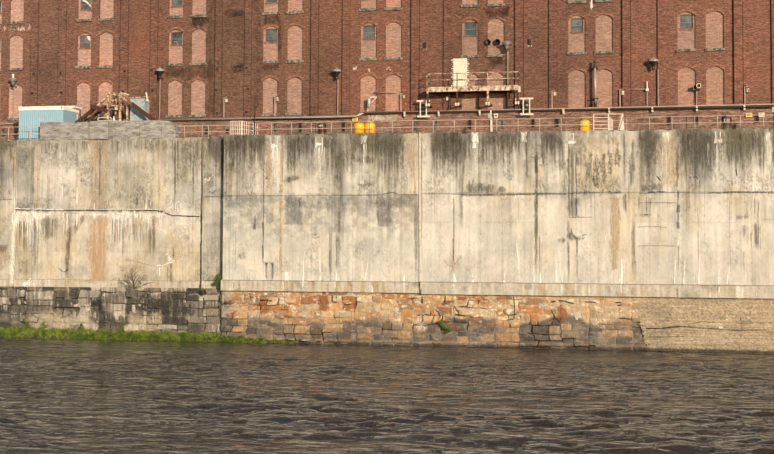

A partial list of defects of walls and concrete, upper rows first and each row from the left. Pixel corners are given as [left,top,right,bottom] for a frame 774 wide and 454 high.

damp [222,136,403,187]
damp [662,131,772,197]
damp [9,188,162,284]